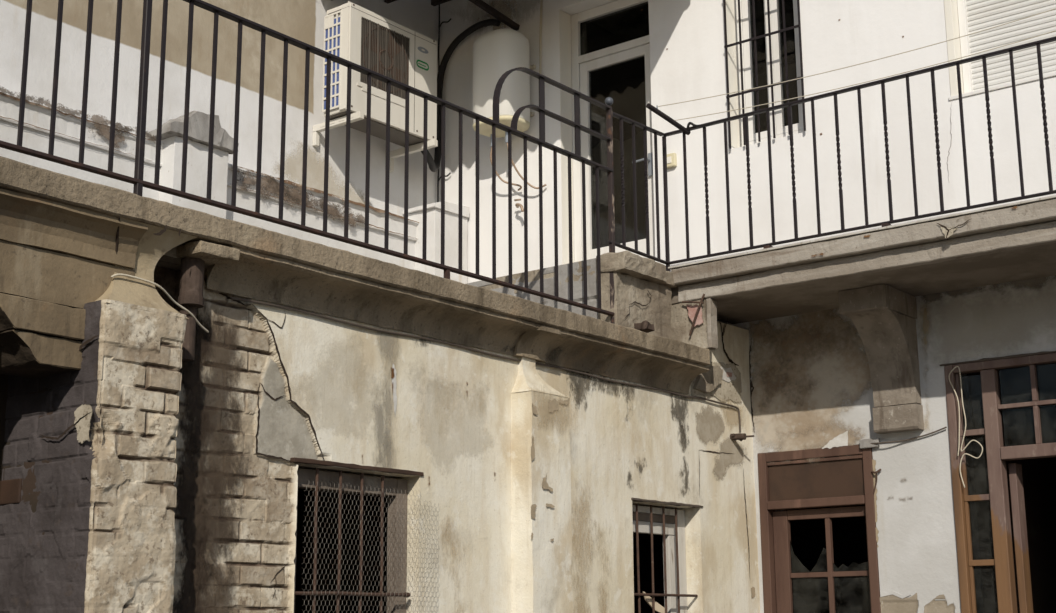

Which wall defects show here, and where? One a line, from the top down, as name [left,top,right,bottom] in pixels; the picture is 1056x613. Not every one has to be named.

spalling [74,404,93,443]
damp [172,315,247,613]
damp [376,327,397,467]
damp [567,371,636,408]
damp [671,393,689,494]
crack [699,450,750,569]
crack [717,317,755,433]
flaking render [822,431,880,548]
flaking render [880,591,955,613]